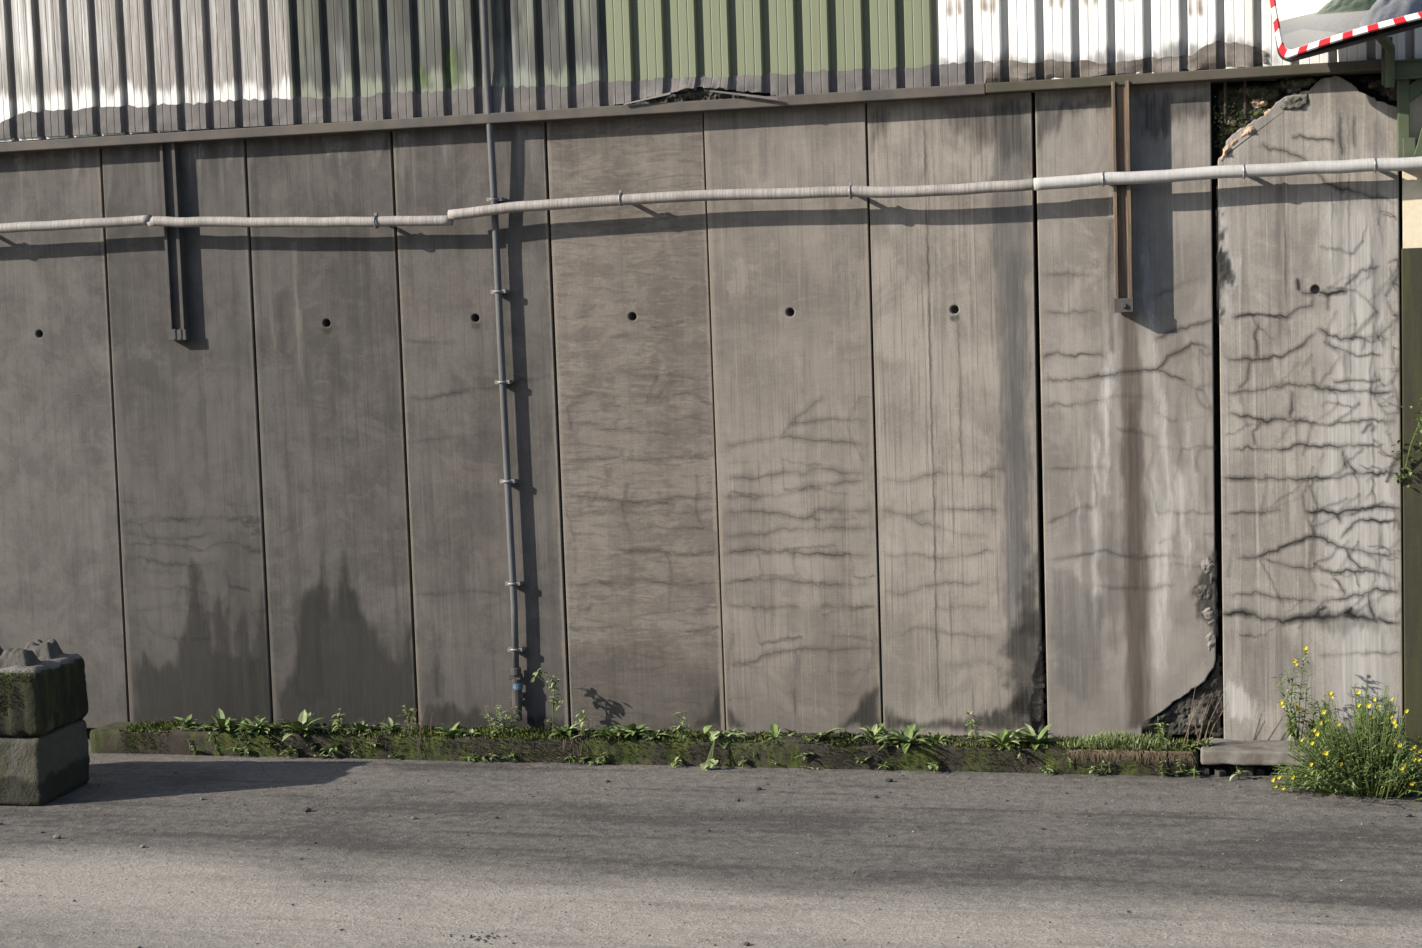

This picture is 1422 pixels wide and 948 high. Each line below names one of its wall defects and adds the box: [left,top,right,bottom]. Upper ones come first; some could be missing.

spalling [1217,76,1319,160]
crack [1265,127,1354,192]
damp [847,106,1040,730]
efflorescence [1079,309,1115,597]
crack [1047,324,1197,381]
efflorescence [1152,344,1196,667]
crack [1223,267,1396,624]
damp [138,567,563,728]
spalling [1143,554,1223,737]